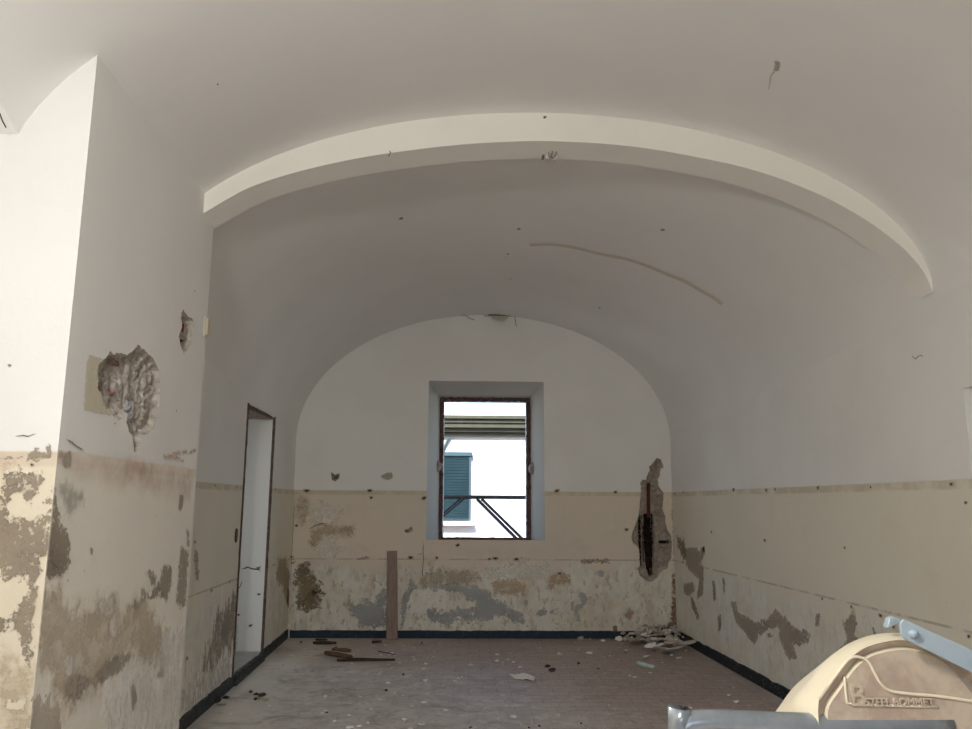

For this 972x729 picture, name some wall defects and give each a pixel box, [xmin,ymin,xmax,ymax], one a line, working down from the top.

spalling [179,310,193,352]
spalling [97,345,160,454]
peeling [0,445,71,665]
peeling [684,546,725,620]
leakage [39,592,163,702]
peeling [731,602,820,660]
peeling [840,607,858,649]